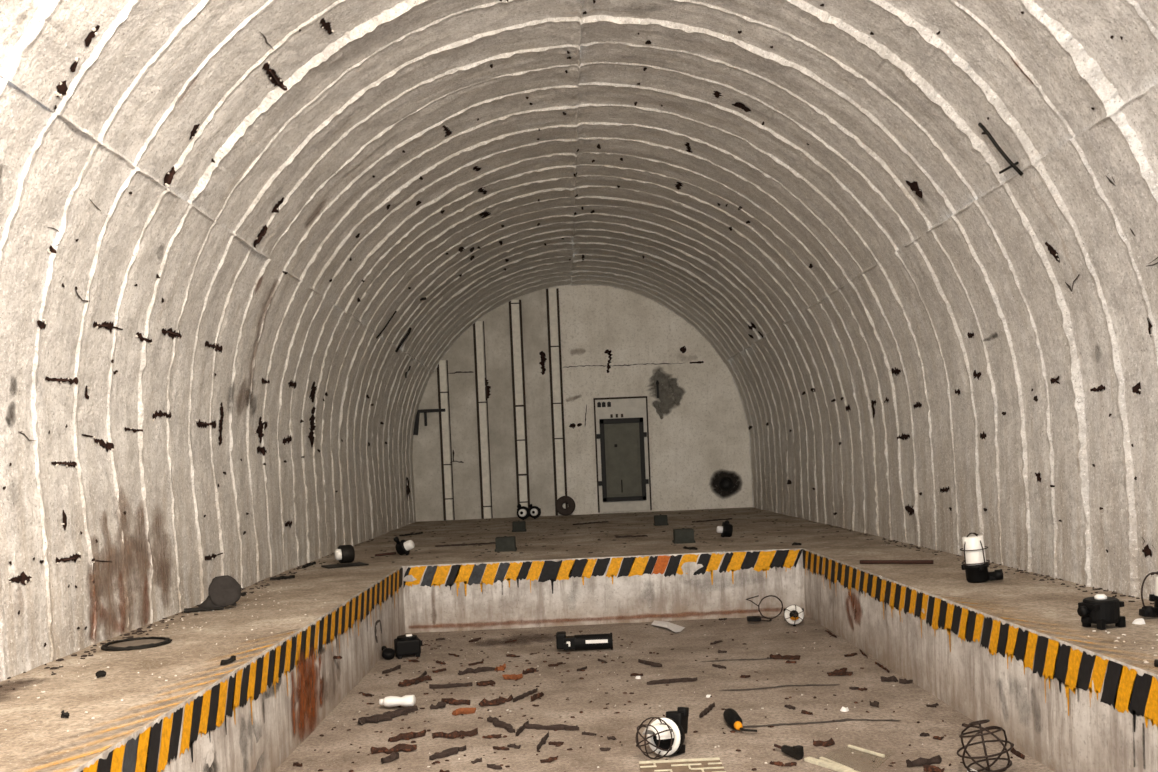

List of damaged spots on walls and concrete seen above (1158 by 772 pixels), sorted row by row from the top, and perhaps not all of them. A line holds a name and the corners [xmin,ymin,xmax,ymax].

water stain [649,368,685,419]
rust [292,649,323,736]